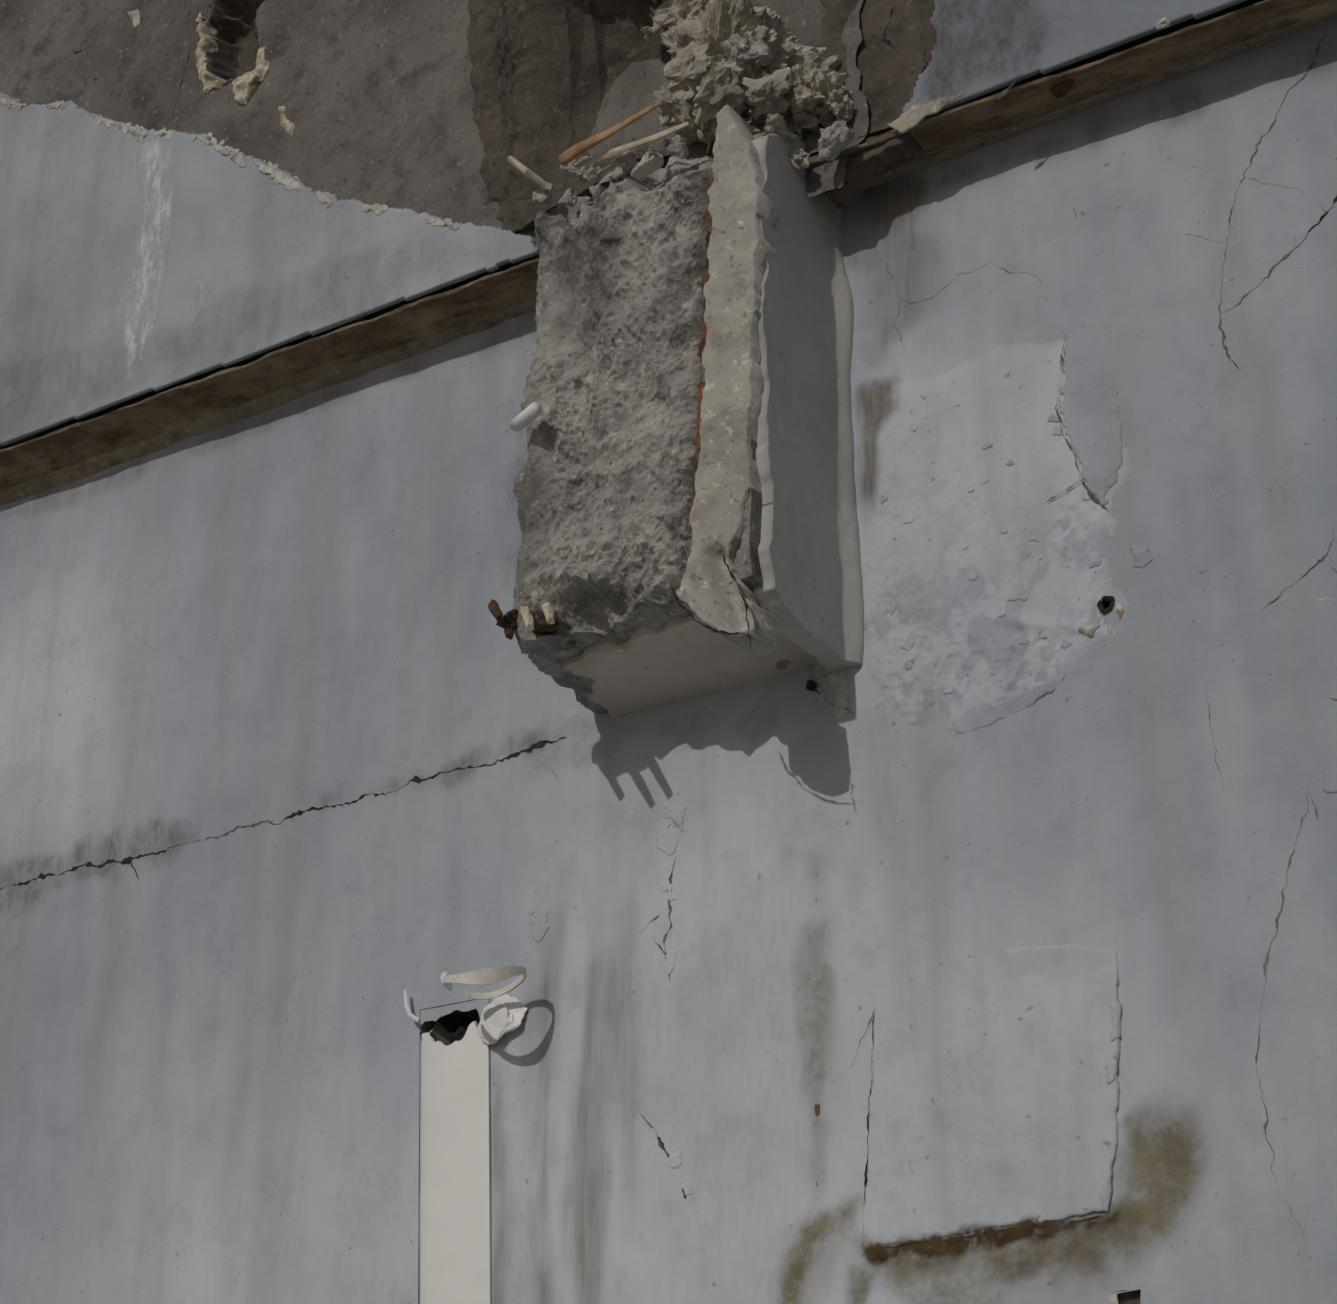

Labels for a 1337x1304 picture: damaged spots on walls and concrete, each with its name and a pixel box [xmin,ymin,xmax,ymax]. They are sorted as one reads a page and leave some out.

spalling [0,0,716,255]
spalling [751,0,964,208]
crack [1186,23,1337,369]
corrosion [496,609,559,634]
crack [1263,518,1337,609]
crack [1200,670,1225,791]
crack [0,737,566,890]
crack [641,858,676,979]
crack [1255,794,1318,1240]
corrosion [782,1208,850,1304]
corrosion [865,1122,1197,1271]